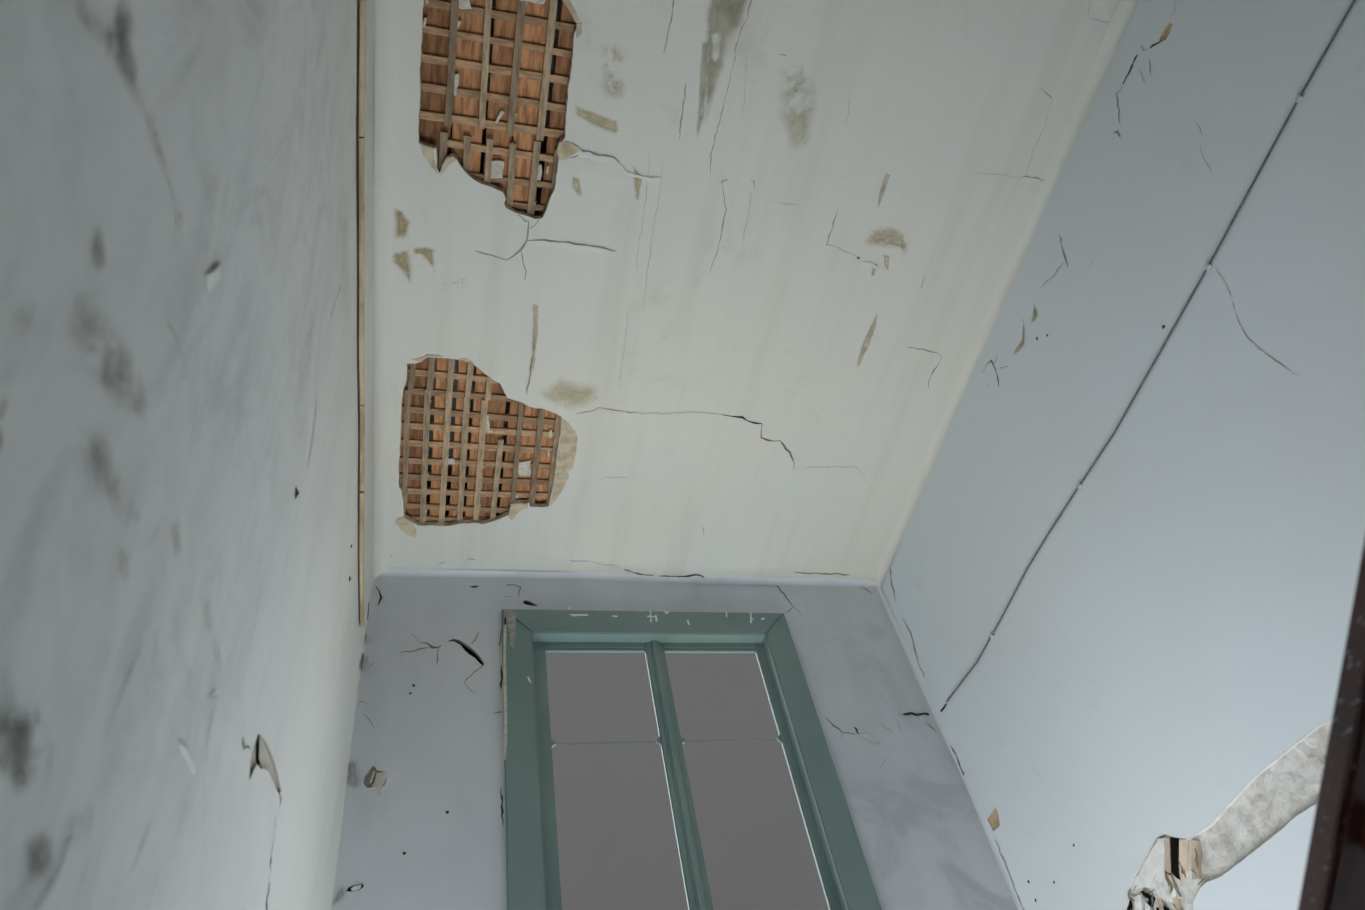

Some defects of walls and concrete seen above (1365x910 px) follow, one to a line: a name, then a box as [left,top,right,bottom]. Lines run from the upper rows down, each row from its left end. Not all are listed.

flaking render [418,0,582,219]
water stain [700,0,743,120]
crack [710,0,798,271]
crack [1110,0,1177,141]
crack [476,84,867,482]
crack [983,357,1008,388]
crack [1041,234,1094,288]
crack [1216,270,1297,376]
flaking render [395,354,578,537]
crack [357,586,503,728]
crack [498,788,506,825]
flaking render [1131,838,1182,910]